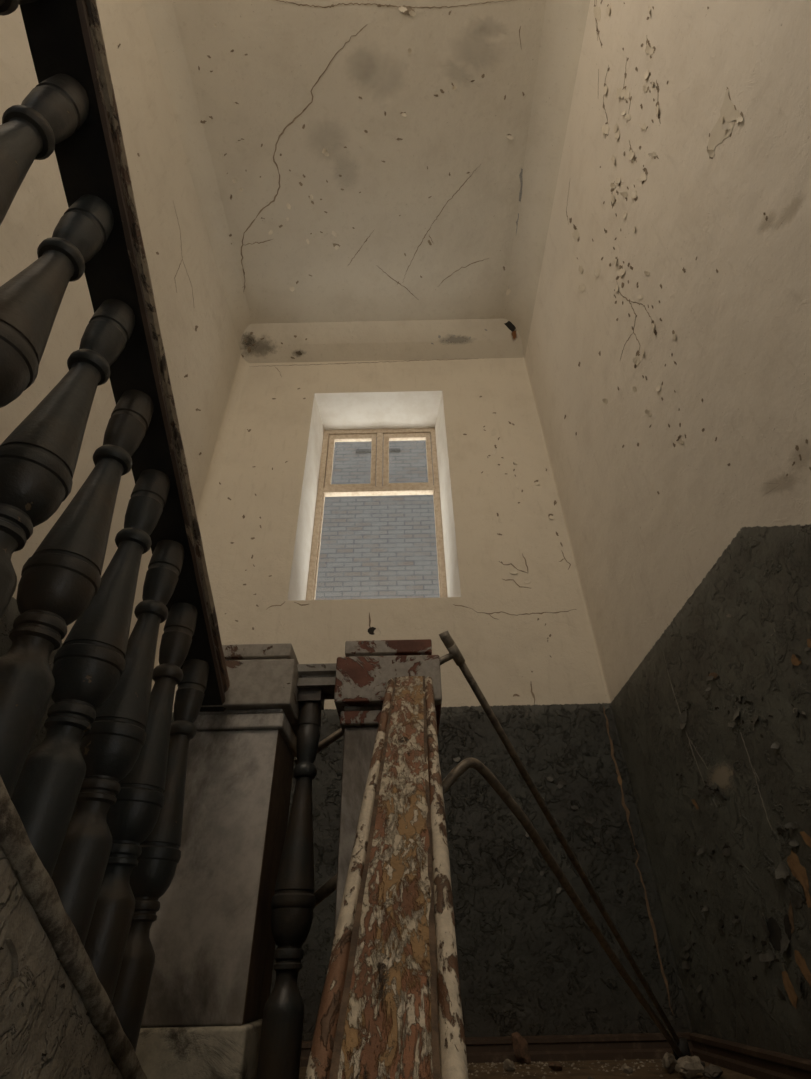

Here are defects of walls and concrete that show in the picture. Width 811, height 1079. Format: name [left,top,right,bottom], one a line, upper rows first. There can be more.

crack [241,0,512,296]
crack [618,291,653,359]